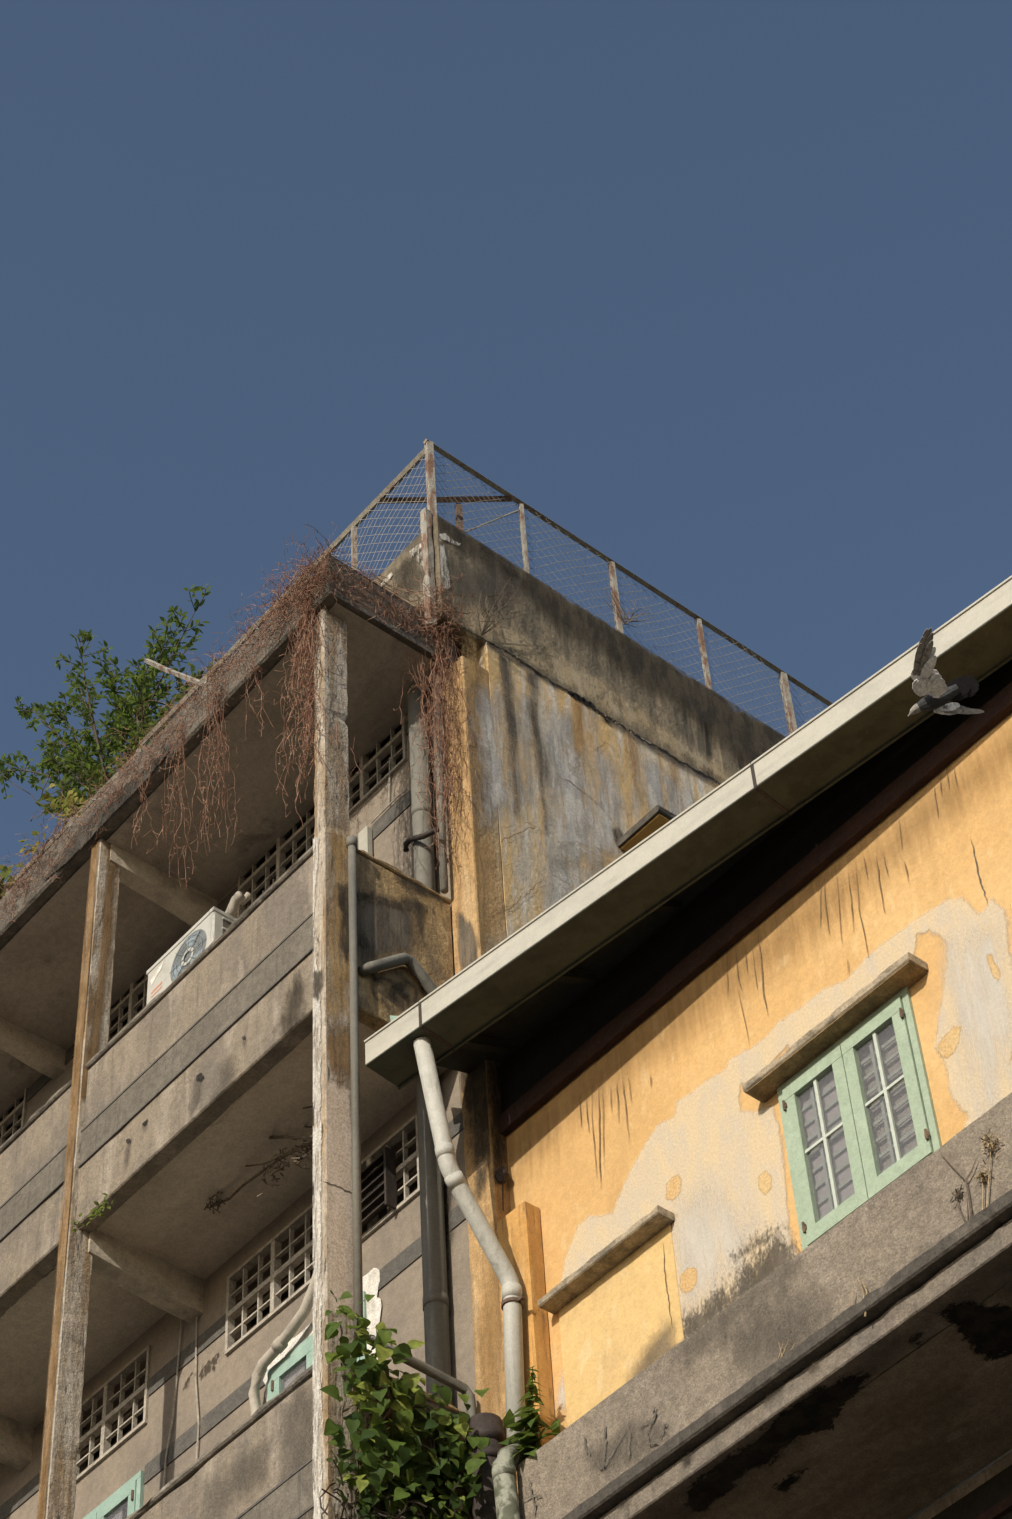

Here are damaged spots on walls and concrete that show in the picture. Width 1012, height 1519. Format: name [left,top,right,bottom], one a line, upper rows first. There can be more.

water stain [438,516,786,826]
water stain [280,831,443,1081]
water stain [458,913,504,970]
water stain [727,935,768,1047]
water stain [820,855,888,957]
water stain [579,1079,631,1182]
peeling [561,897,1012,1340]
water stain [637,1229,795,1374]